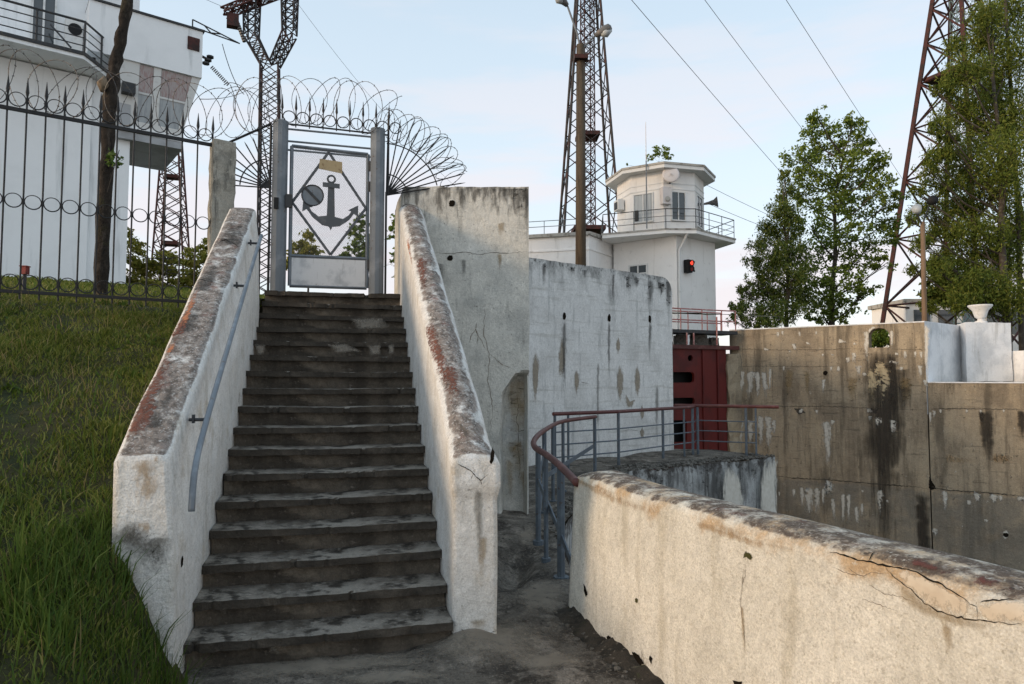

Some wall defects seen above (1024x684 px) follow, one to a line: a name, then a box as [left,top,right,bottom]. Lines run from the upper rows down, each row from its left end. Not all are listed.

leakage [493,188,528,217]
corrosion [407,243,429,286]
corrosion [127,297,195,437]
corrosion [426,323,459,403]
crack [458,309,524,478]
leakage [740,416,776,444]
leakage [740,366,785,395]
leakage [779,326,929,530]
leakage [966,410,1005,450]
crack [831,552,1020,625]